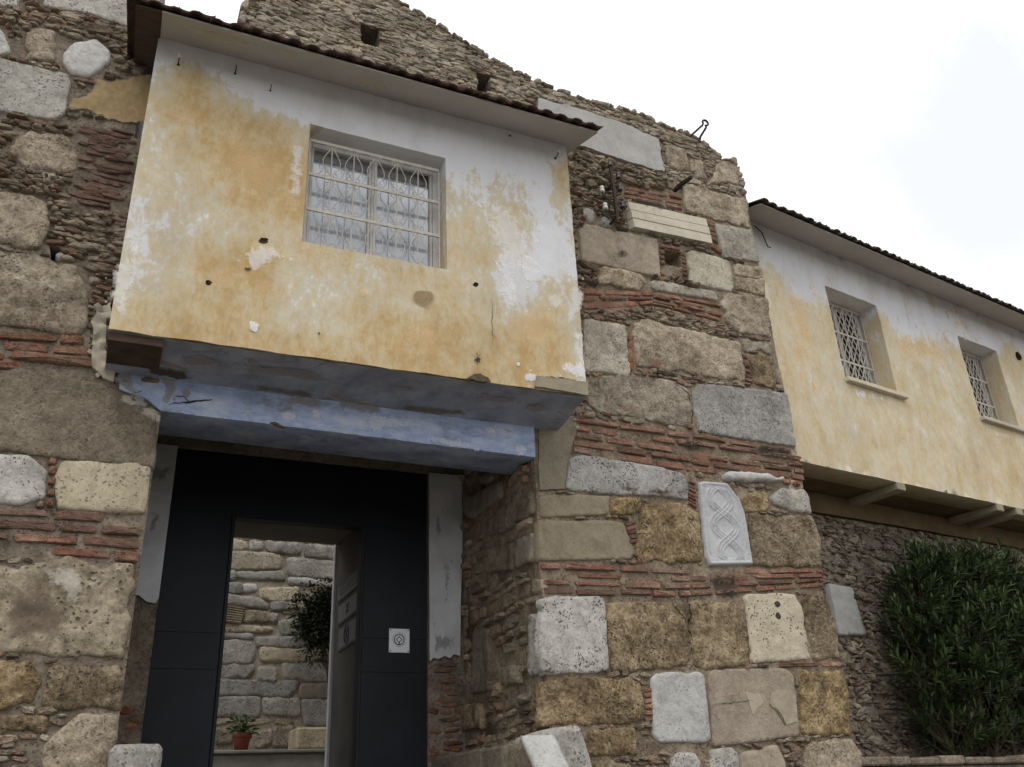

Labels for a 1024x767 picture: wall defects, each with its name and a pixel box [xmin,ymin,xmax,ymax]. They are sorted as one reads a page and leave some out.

peeling [245,237,278,270]
peeling [549,278,583,310]
peeling [560,333,585,381]
leakage [149,369,191,380]
crack [171,396,213,404]